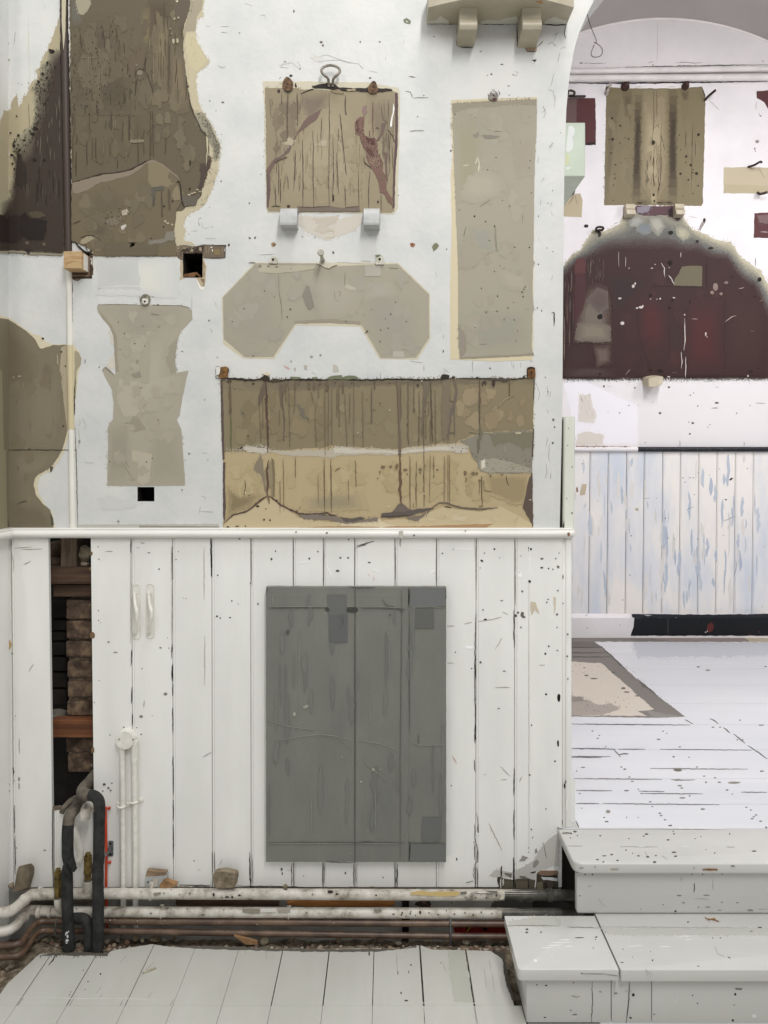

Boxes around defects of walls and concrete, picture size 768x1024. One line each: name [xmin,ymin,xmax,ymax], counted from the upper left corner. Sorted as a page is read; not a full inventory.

peeling [0,316,82,542]
spalling [82,538,93,570]
peeling [0,0,230,296]
peeling [208,68,554,536]
peeling [562,86,768,383]
hole [53,737,90,806]